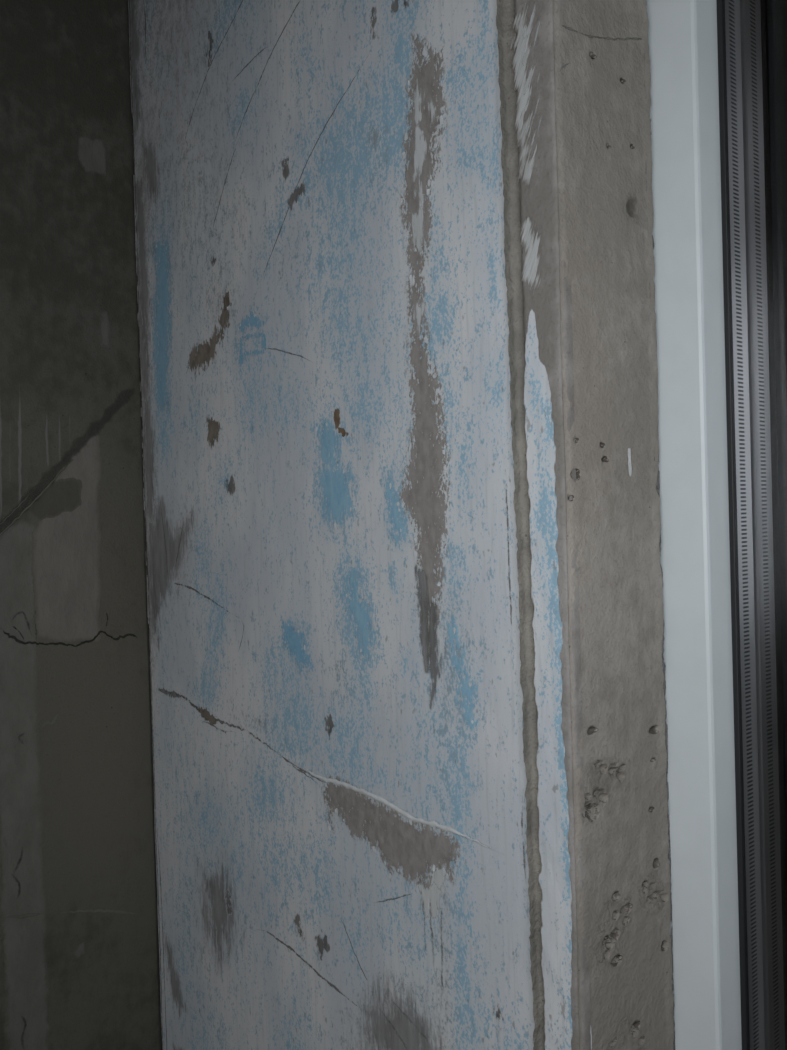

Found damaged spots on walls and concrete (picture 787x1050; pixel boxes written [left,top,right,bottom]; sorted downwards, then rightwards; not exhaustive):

peeling [368,0,412,43]
crack [3,0,313,1050]
flaking render [320,773,461,948]
flaking render [379,26,482,733]